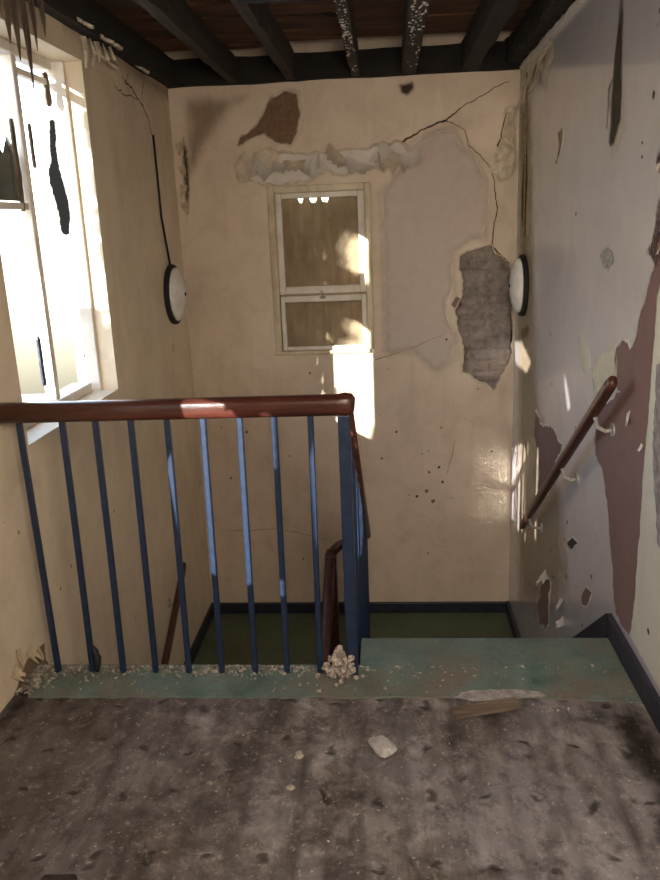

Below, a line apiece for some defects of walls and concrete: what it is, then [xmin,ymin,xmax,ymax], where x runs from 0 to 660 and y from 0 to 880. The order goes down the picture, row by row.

peeling [235,87,421,187]
crack [402,82,508,262]
flaking render [451,243,515,392]
peeling [515,409,564,496]
peeling [591,253,660,689]
peeling [529,570,564,631]
peeling [581,575,592,608]